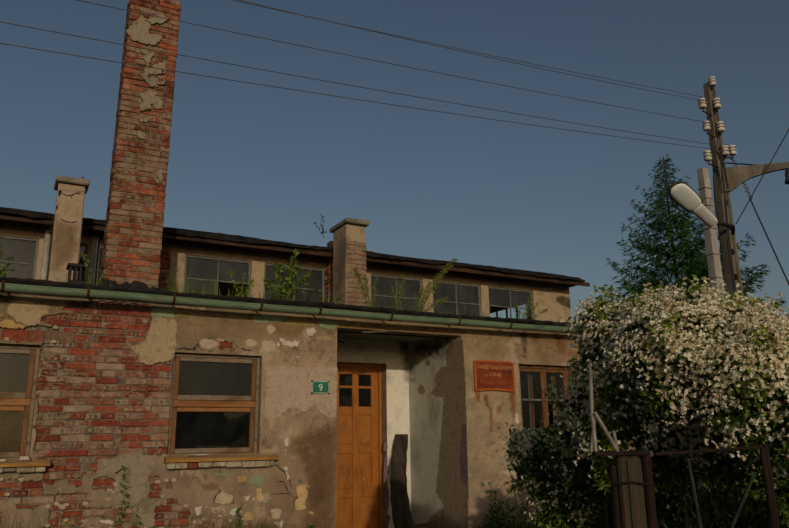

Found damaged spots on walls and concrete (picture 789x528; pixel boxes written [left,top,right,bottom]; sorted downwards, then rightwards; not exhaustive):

peeling [126,12,168,140]
spalling [0,300,283,528]
peeling [284,467,313,515]